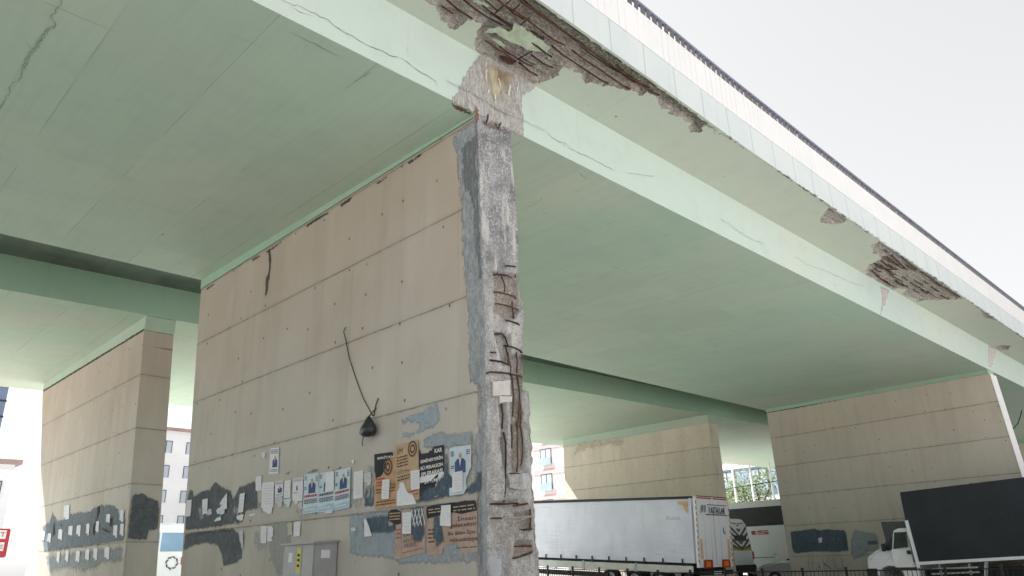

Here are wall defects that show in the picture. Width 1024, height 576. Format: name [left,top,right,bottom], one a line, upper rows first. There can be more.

crack [0,1,62,109]
crack [283,0,642,181]
corrosion [488,55,516,98]
spalling [820,207,847,224]
spalling [425,0,707,576]
spalling [865,242,963,302]